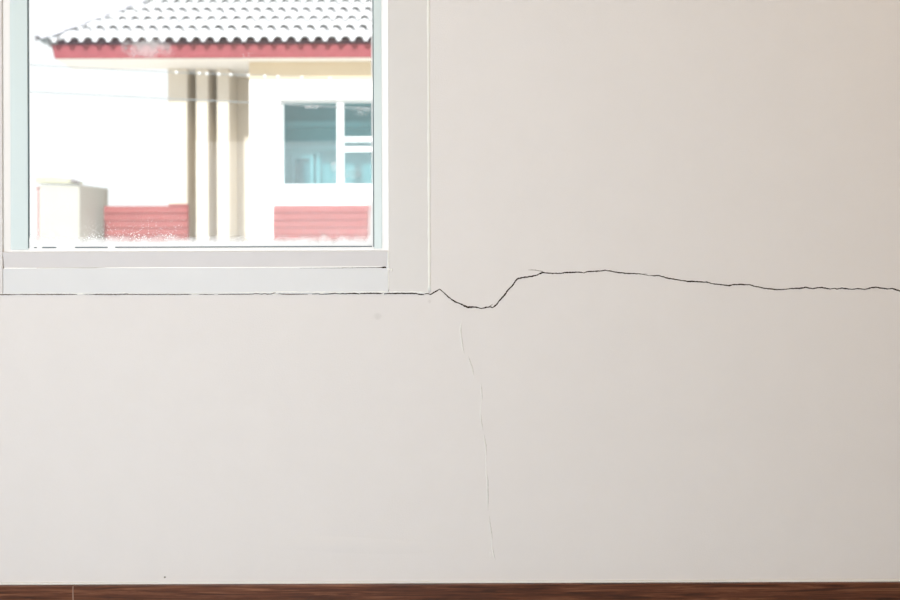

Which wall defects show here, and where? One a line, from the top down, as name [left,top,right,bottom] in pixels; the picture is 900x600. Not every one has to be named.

crack [0,270,900,560]